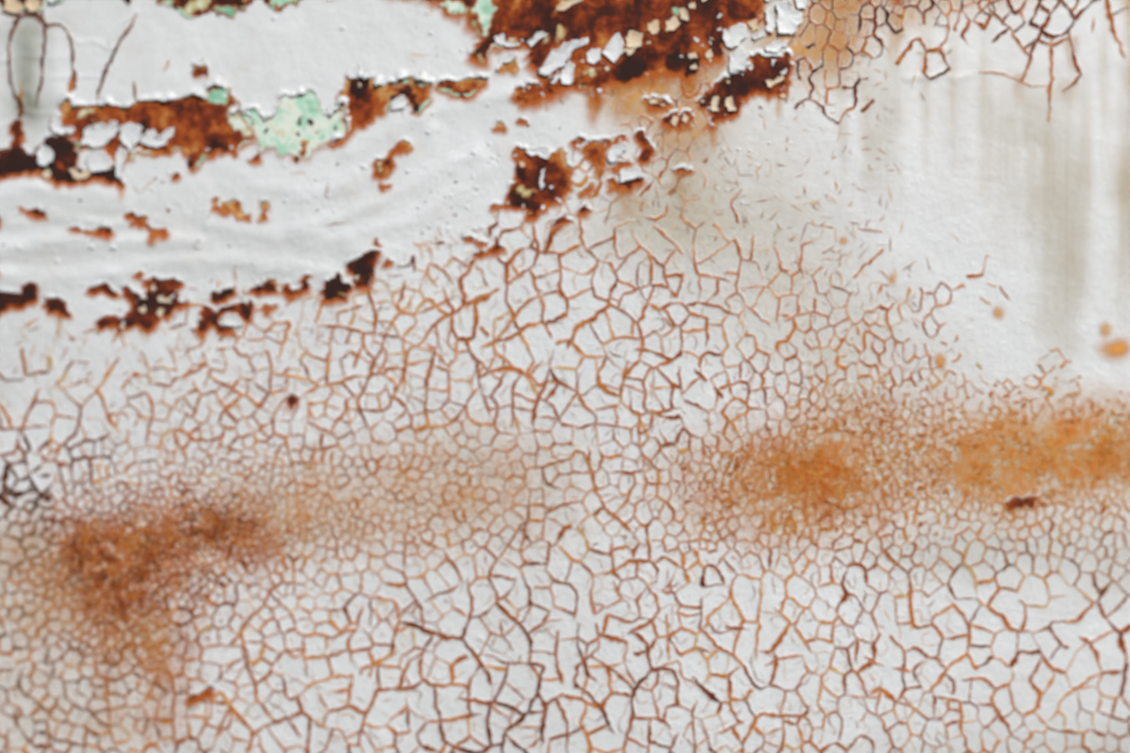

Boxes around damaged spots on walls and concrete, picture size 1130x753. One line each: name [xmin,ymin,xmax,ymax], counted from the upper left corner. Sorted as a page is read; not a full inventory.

rust [769,0,905,71]
peeling [0,0,808,233]
rust [588,72,715,153]
crack [744,0,1129,174]
peeling [68,207,169,244]
crack [700,130,785,230]
peeling [0,279,73,319]
peeling [86,236,396,337]
crack [966,254,1011,301]
crack [0,317,88,383]
rust [683,375,1130,546]
rust [37,447,541,715]